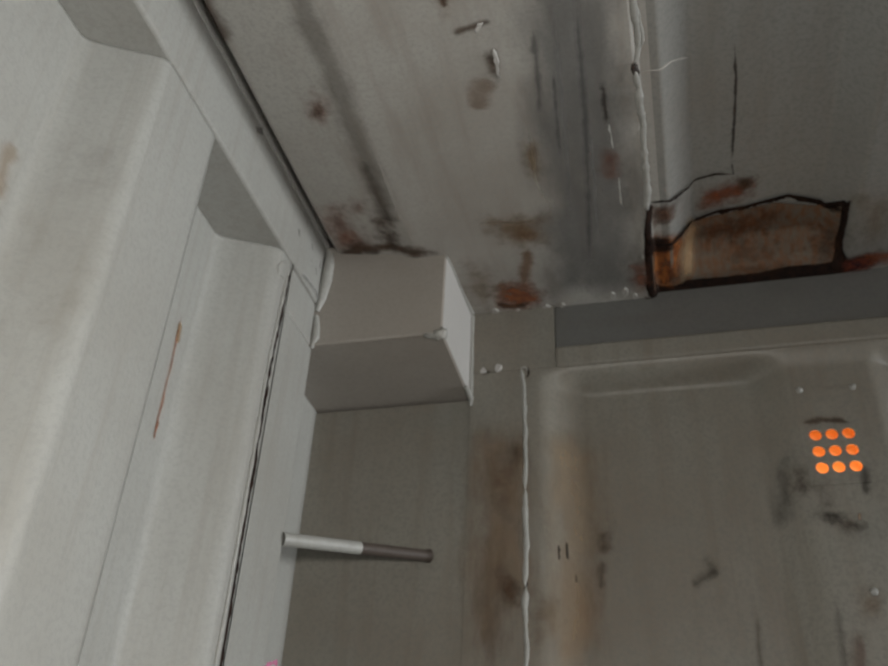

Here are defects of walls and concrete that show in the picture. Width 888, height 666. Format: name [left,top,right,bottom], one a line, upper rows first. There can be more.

rust [336,220,428,256]
rust [644,201,888,299]
rust [497,252,538,309]